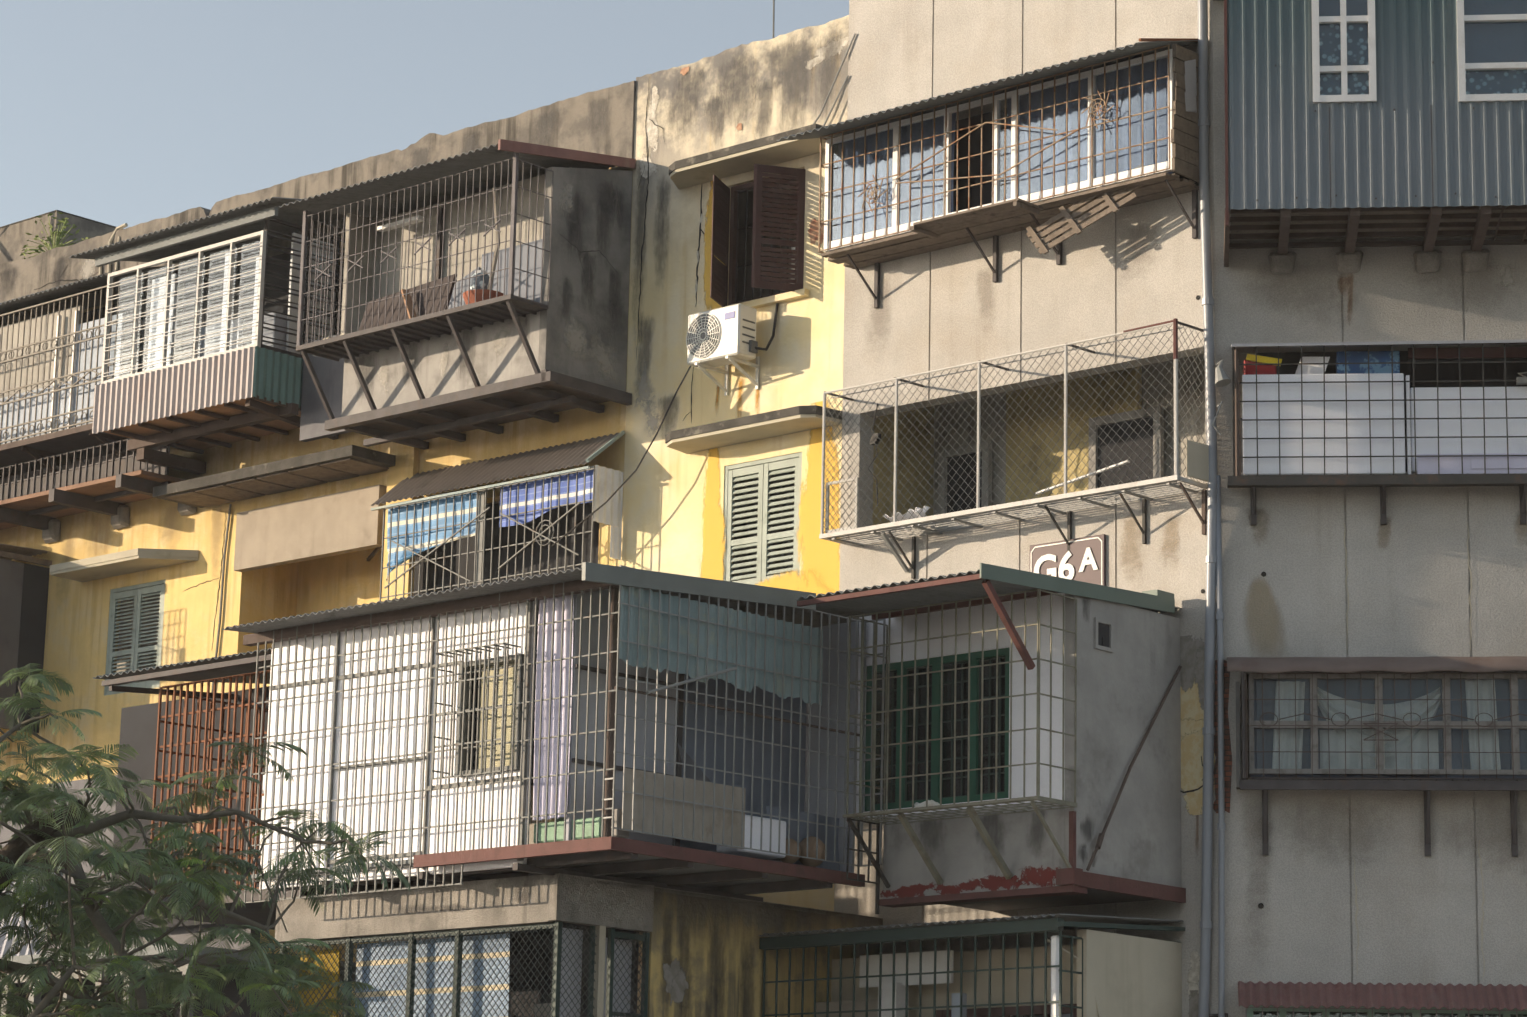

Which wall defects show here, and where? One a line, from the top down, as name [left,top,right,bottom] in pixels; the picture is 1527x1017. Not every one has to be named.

leakage [673,40,834,132]
leakage [637,176,665,265]
peeling [1180,635,1232,815]
peeling [880,865,1062,898]
leakage [663,916,689,1017]